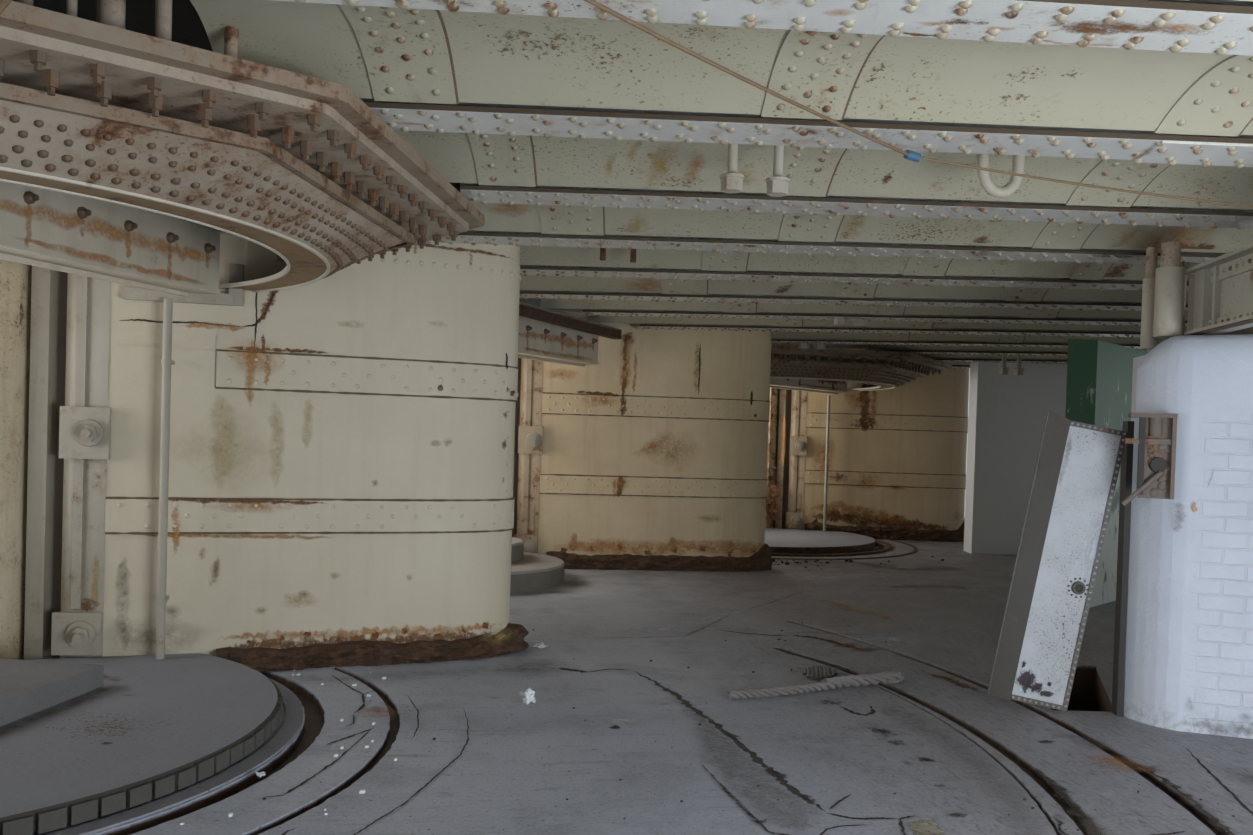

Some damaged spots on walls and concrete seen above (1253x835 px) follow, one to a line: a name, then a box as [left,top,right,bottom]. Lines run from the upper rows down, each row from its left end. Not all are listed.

corrosion [4,203,208,282]
corrosion [232,335,325,399]
corrosion [578,332,637,415]
corrosion [852,383,876,431]
corrosion [560,537,763,557]
corrosion [813,505,944,530]
crack [559,668,895,835]
crack [1186,748,1253,814]